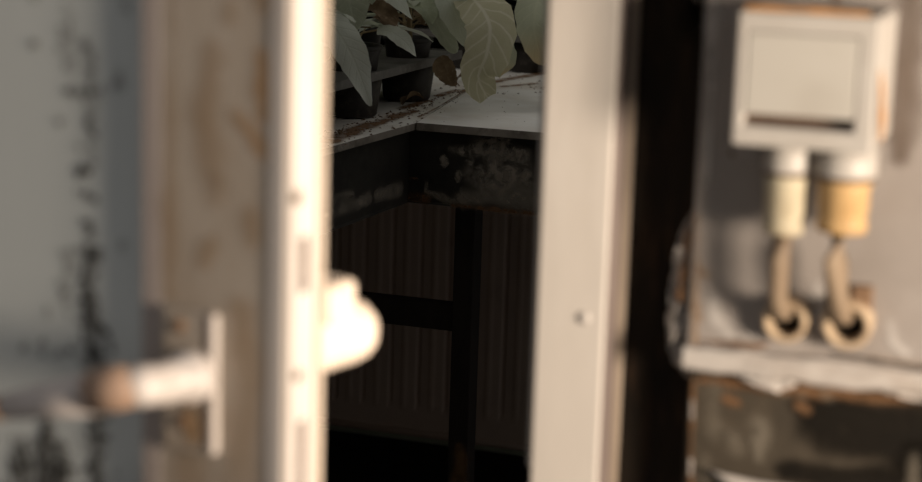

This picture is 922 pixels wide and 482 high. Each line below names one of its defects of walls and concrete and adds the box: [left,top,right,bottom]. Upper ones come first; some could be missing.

flaking render [666,210,694,378]
flaking render [735,374,797,393]
leakage [2,414,117,482]